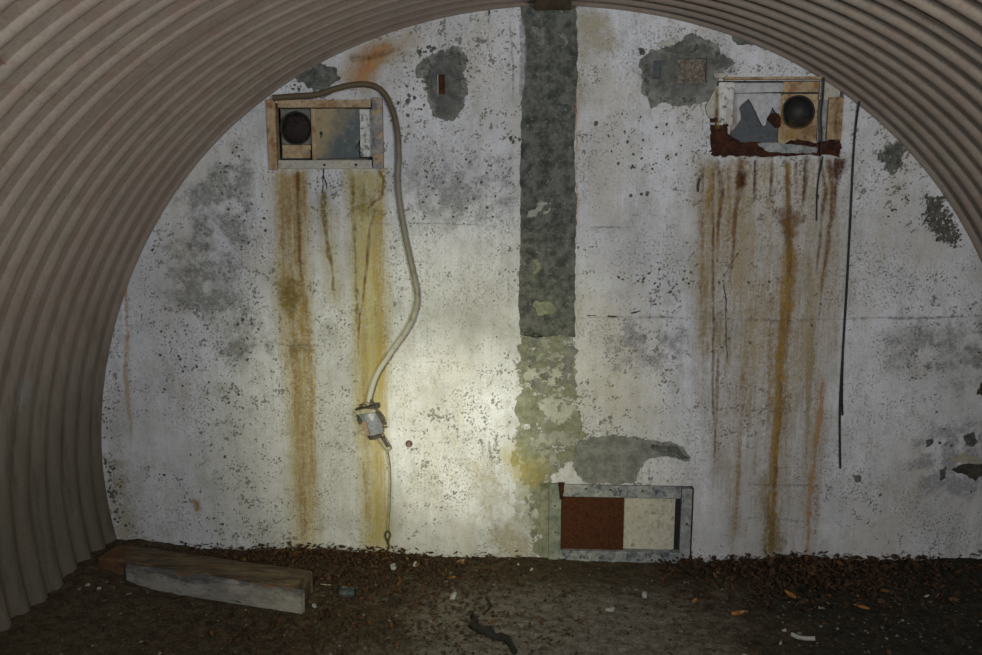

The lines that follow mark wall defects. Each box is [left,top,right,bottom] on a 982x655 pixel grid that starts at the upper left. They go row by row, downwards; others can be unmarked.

spalling [291,63,341,100]
spalling [394,45,469,122]
spalling [638,33,735,119]
rust [710,89,735,150]
spalling [732,36,766,50]
rust [786,139,818,147]
peeling [878,141,965,248]
rust [348,171,386,414]
peeling [509,6,698,558]
rust [278,173,313,521]
rust [700,159,845,551]
spalling [926,424,982,493]